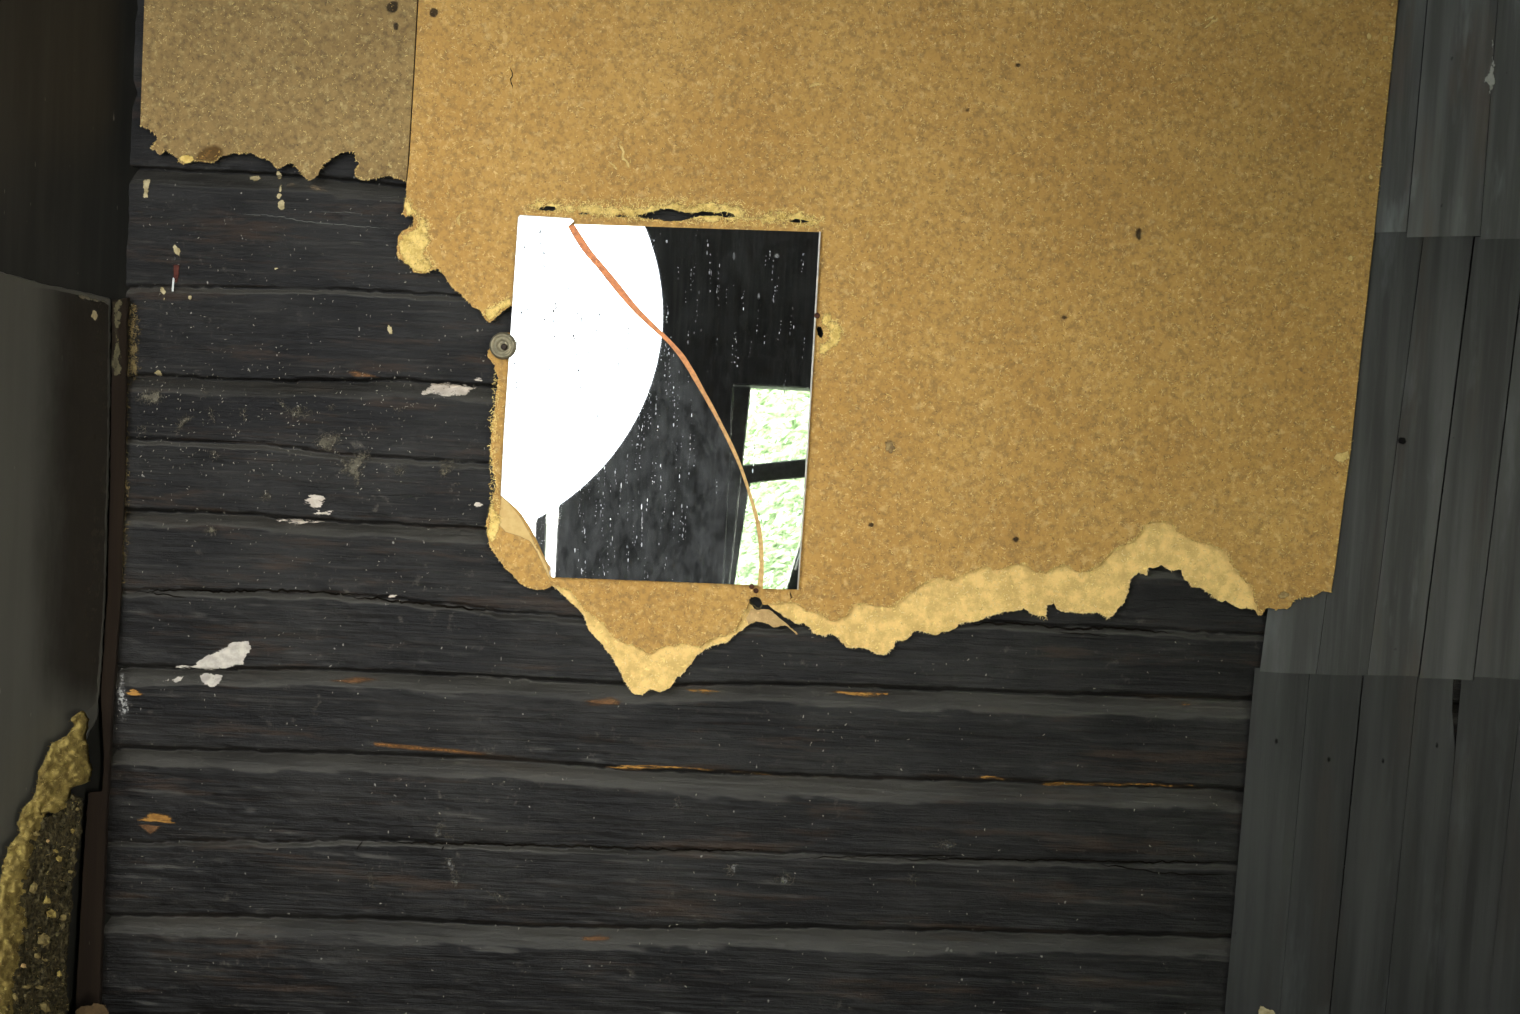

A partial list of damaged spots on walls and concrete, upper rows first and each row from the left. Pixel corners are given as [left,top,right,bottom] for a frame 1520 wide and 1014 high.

peeling [277,510,332,524]
peeling [553,521,1259,696]
spalling [7,794,83,1014]